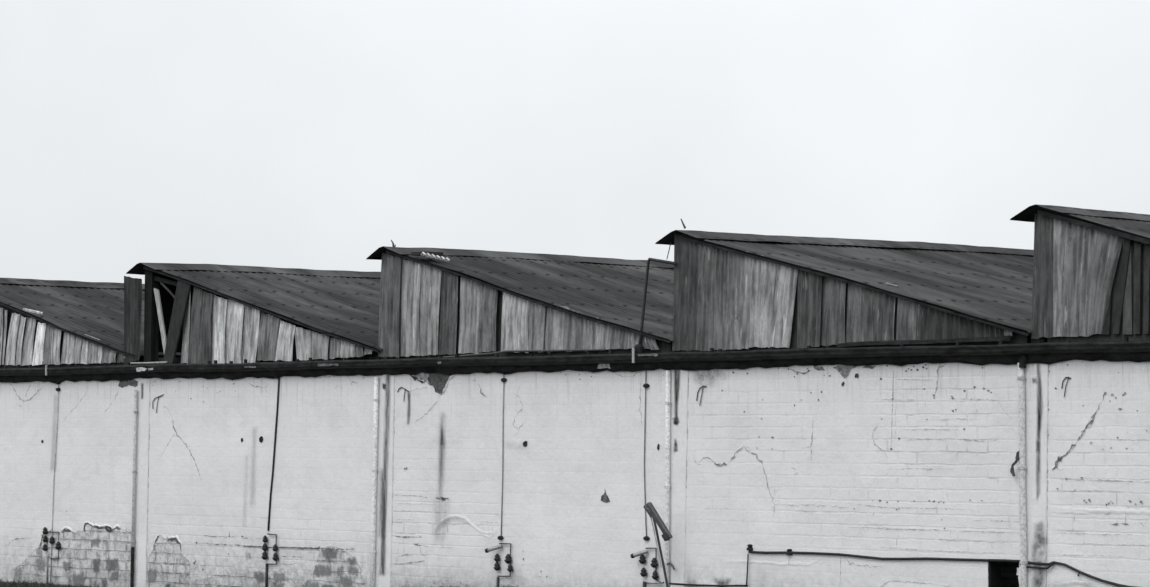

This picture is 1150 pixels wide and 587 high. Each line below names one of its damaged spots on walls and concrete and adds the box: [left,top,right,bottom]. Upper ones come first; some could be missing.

flaking render [410,362,453,395]
peeling [14,510,135,587]
crack [692,446,1020,578]
crack [1050,394,1148,556]